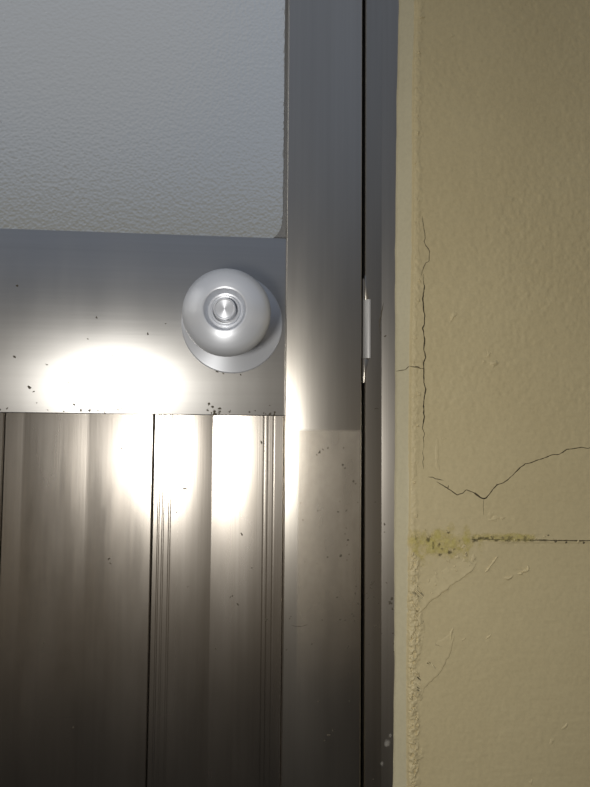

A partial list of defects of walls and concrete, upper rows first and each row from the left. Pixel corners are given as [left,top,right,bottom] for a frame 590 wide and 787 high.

crack [398,216,589,514]
crack [479,535,590,544]
spalling [406,551,425,787]